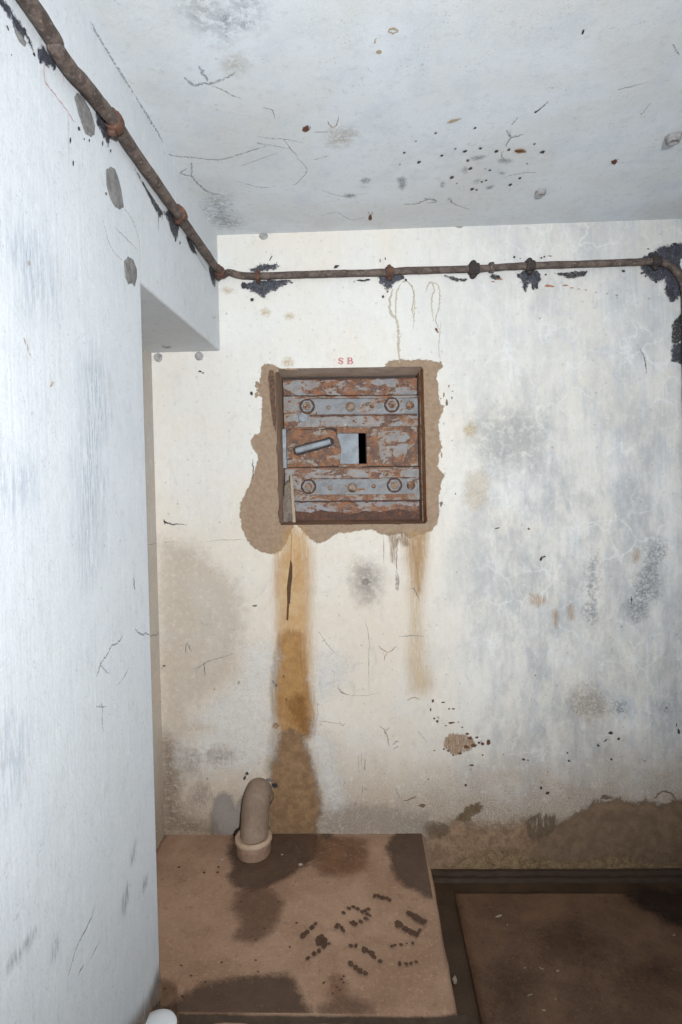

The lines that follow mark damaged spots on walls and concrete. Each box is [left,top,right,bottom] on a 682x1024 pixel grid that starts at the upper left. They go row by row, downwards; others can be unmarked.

crack [286,534,300,620]
rust [269,509,424,874]
water stain [212,795,318,939]
water stain [387,790,682,897]
water stain [172,974,366,1014]